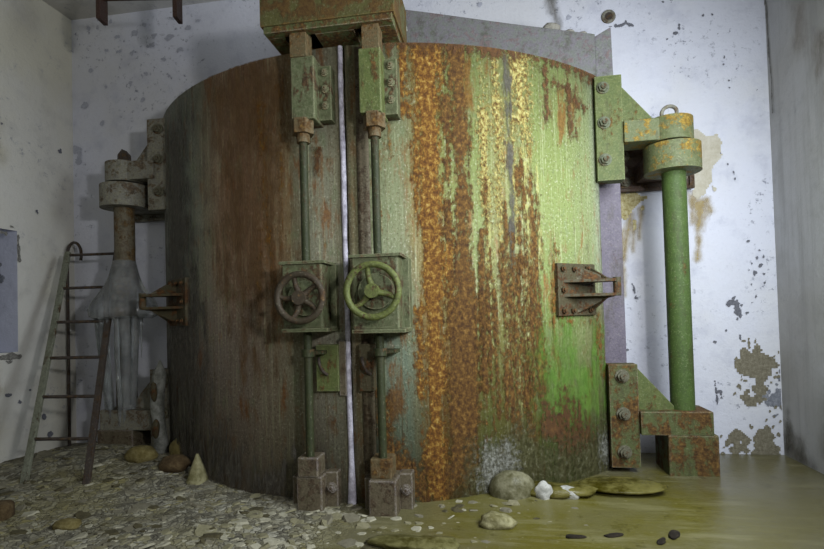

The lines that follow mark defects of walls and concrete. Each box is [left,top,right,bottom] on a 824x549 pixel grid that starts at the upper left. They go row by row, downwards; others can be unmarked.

peeling [726,295,757,320]
peeling [720,335,782,455]